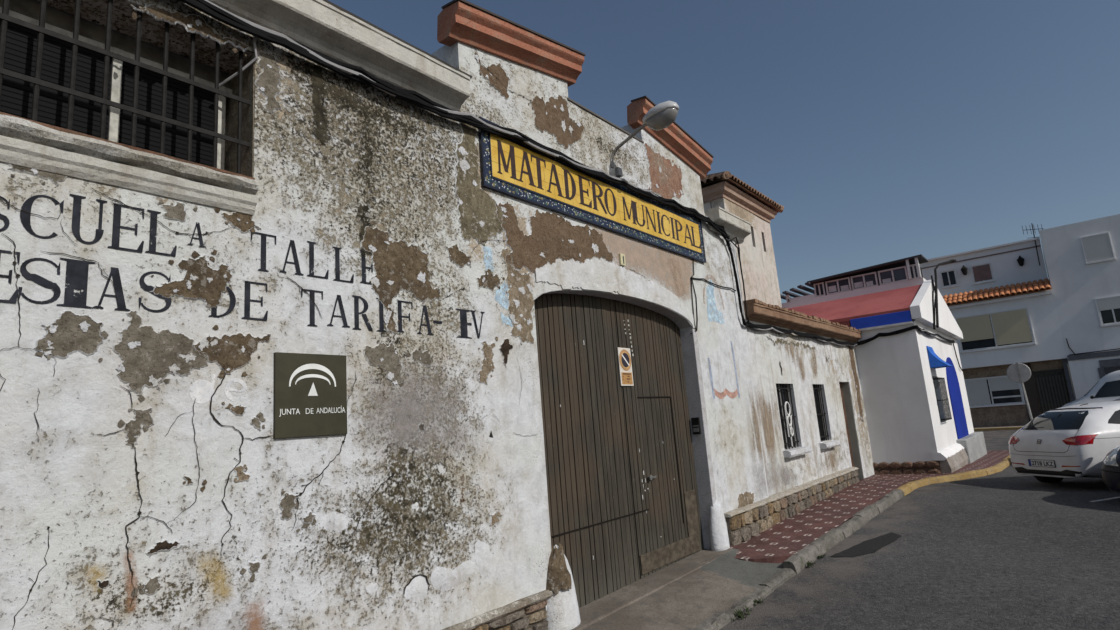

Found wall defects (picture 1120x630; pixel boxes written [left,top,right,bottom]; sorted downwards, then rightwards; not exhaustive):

mould [273,46,426,258]
peeling [529,91,585,150]
peeling [644,142,684,199]
peeling [33,310,271,449]
peeling [149,250,235,309]
leakage [364,311,403,359]
peeling [360,221,445,387]
peeling [444,122,614,385]
crack [97,368,273,607]
crack [291,435,346,531]
leakage [268,365,465,579]
crack [12,526,50,630]